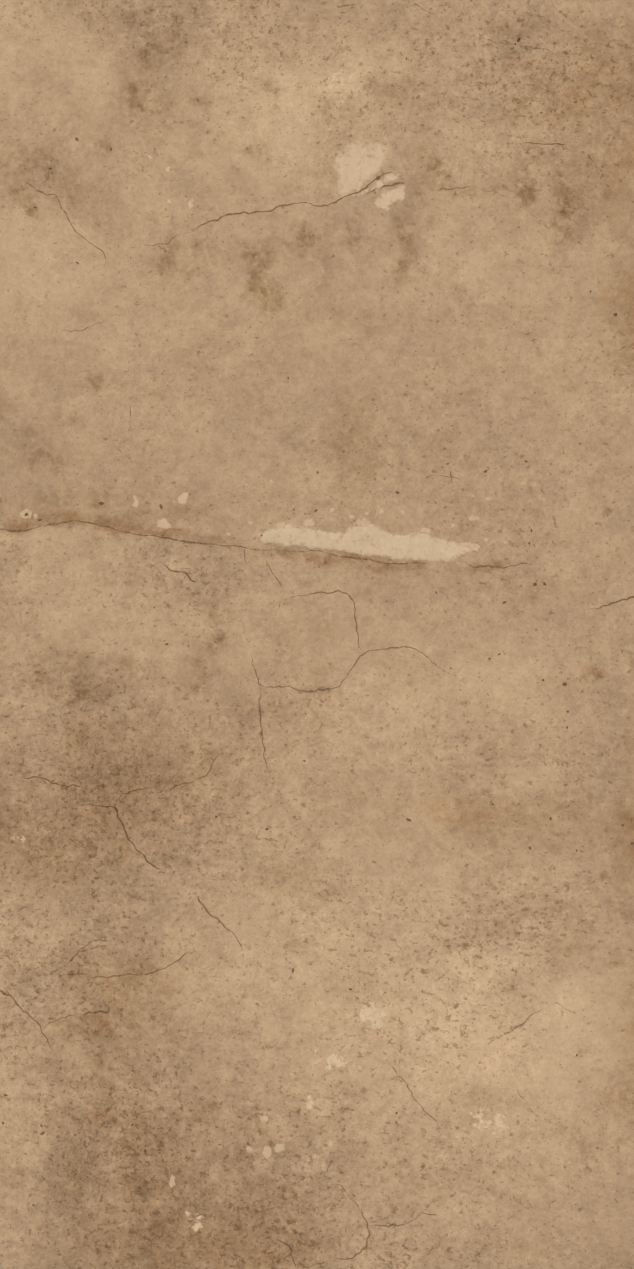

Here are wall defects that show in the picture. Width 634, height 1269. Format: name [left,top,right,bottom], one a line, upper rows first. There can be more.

crack [31,185,106,258]
crack [171,172,405,240]
flaking render [330,134,410,215]
flaking render [257,509,483,567]
crack [472,561,531,569]
crack [2,521,427,764]
crack [27,776,159,869]
crack [198,898,243,950]
crack [69,940,186,978]
crack [0,990,109,1048]